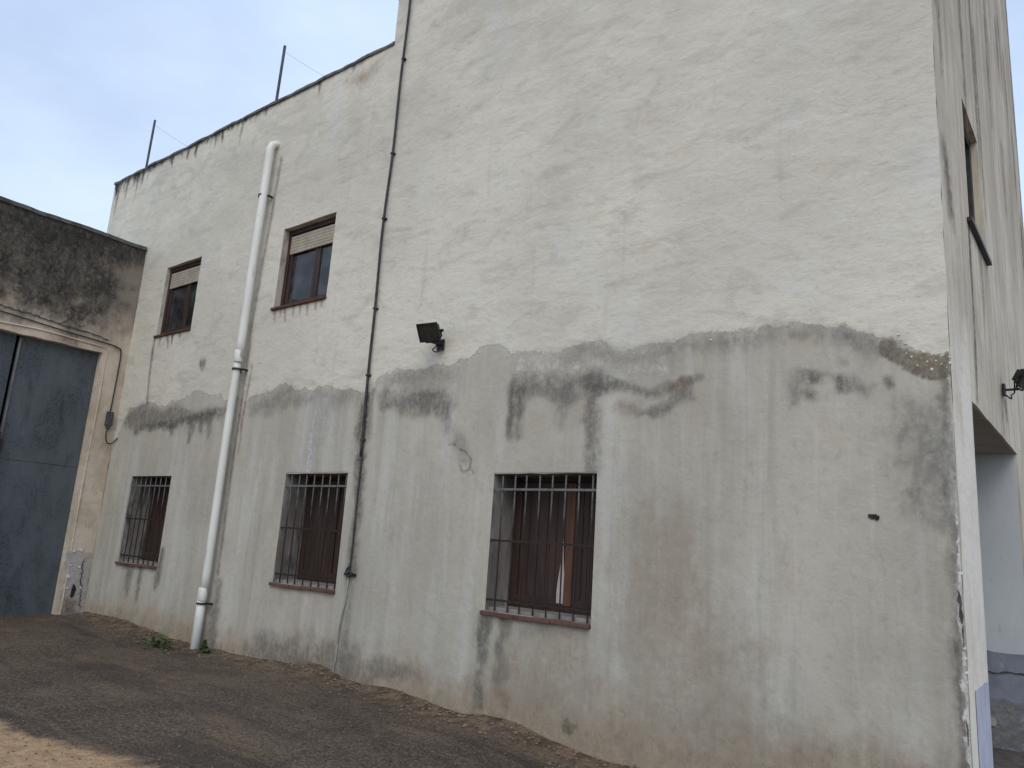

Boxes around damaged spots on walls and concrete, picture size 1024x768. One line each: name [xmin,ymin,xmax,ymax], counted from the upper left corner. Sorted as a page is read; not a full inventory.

water stain [115,115,253,207]
water stain [0,201,146,330]
water stain [127,399,226,439]
water stain [382,390,450,413]
water stain [507,373,693,448]
water stain [350,457,364,571]
peeling [60,322,972,768]